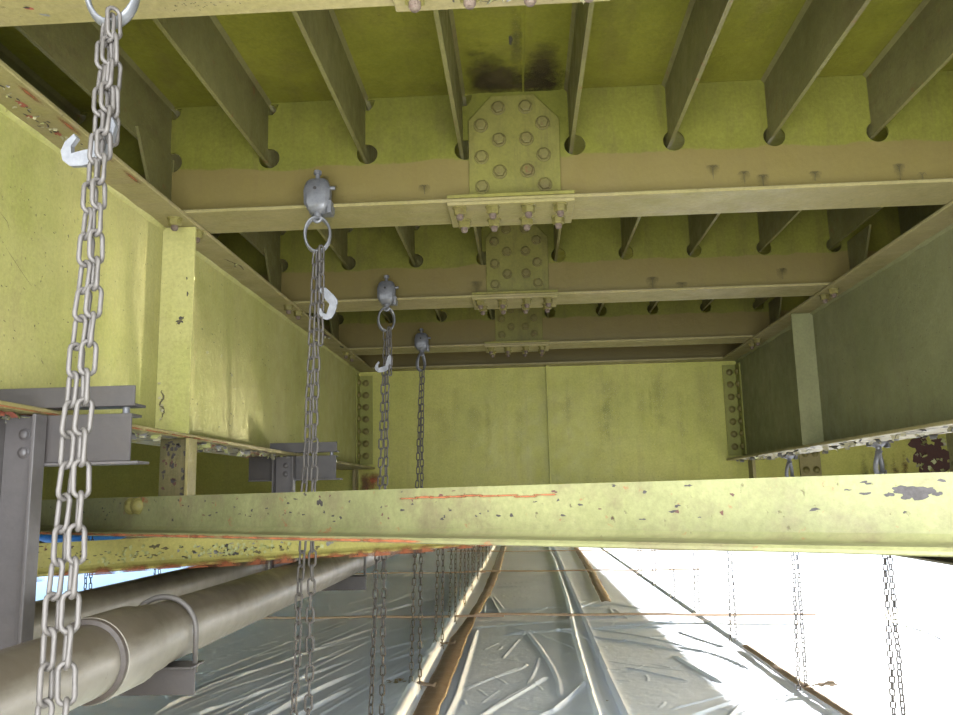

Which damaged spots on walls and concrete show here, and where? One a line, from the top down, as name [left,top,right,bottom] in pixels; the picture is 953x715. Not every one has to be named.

leakage [473,51,557,90]
peeling [0,85,75,142]
spalling [131,430,185,496]
peeling [197,442,290,460]
peeling [736,425,953,462]
corrosion [884,437,950,513]
corrosion [400,490,559,520]
peeling [79,540,299,566]